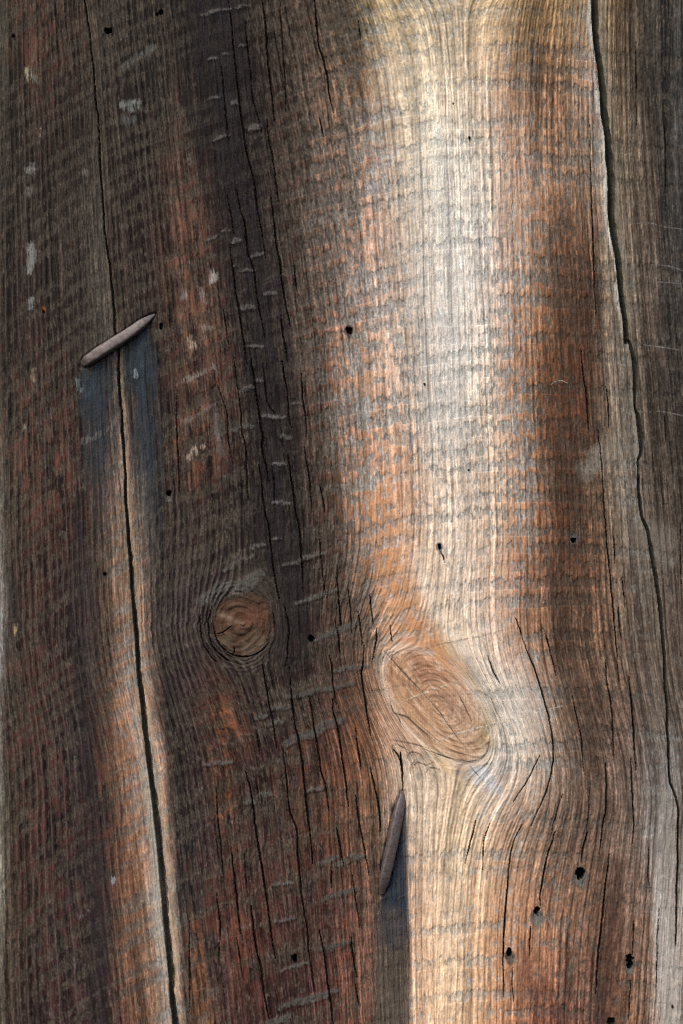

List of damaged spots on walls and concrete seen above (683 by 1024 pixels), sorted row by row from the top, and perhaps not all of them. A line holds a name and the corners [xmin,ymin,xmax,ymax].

crack [84,0,191,1024]
crack [200,0,478,1017]
crack [503,848,531,999]
crack [516,620,559,899]
crack [574,358,649,991]
crack [587,0,682,941]